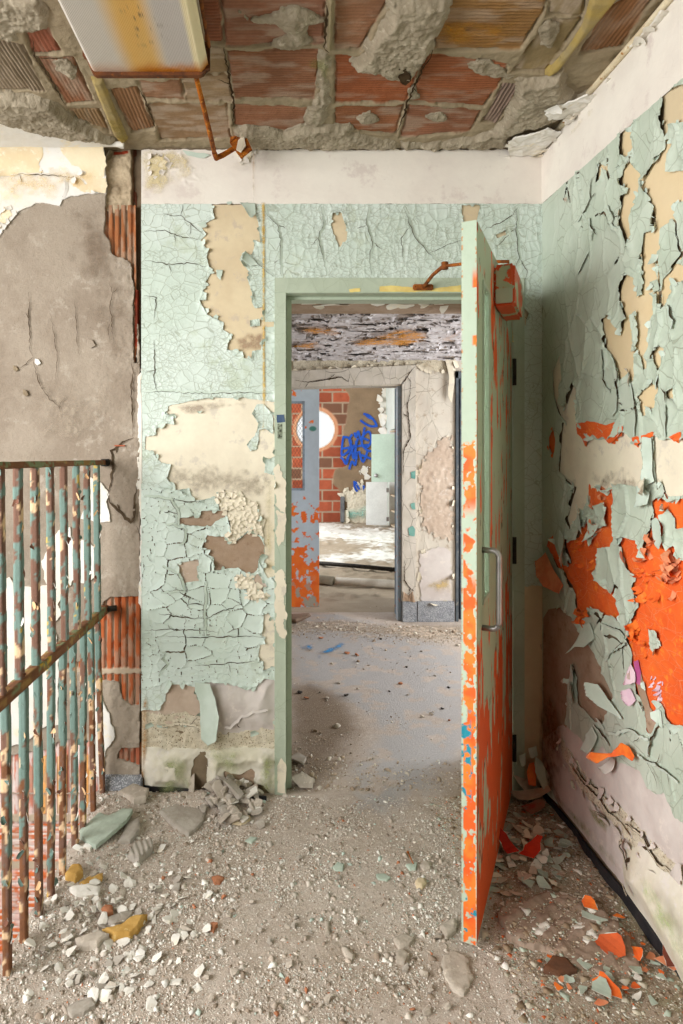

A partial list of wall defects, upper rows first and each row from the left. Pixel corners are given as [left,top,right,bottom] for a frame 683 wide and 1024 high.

peeling [529,95,597,158]
crack [145,207,206,274]
crack [253,205,285,276]
peeling [603,84,683,416]
flaking render [0,147,288,915]
peeling [408,435,455,606]
peeling [490,387,683,922]